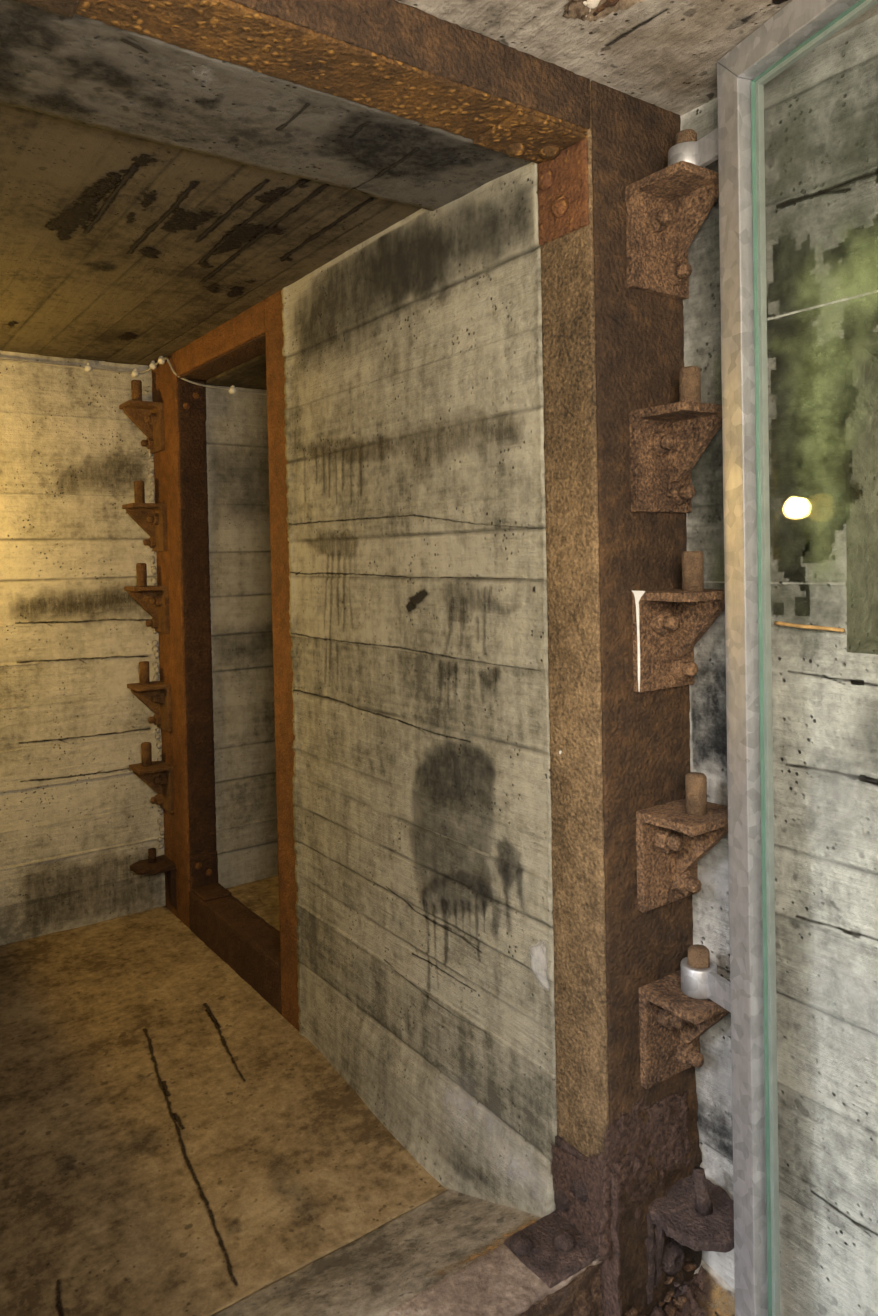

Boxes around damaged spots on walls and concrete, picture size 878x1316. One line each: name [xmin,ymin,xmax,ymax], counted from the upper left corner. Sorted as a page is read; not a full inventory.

spalling [562,0,645,22]
leakage [300,191,527,356]
leakage [426,746,522,964]
crack [203,1003,246,1081]
crack [143,1028,238,1286]
corrosion [551,1092,693,1316]
crack [56,1280,64,1316]
corrosion [699,1274,734,1316]